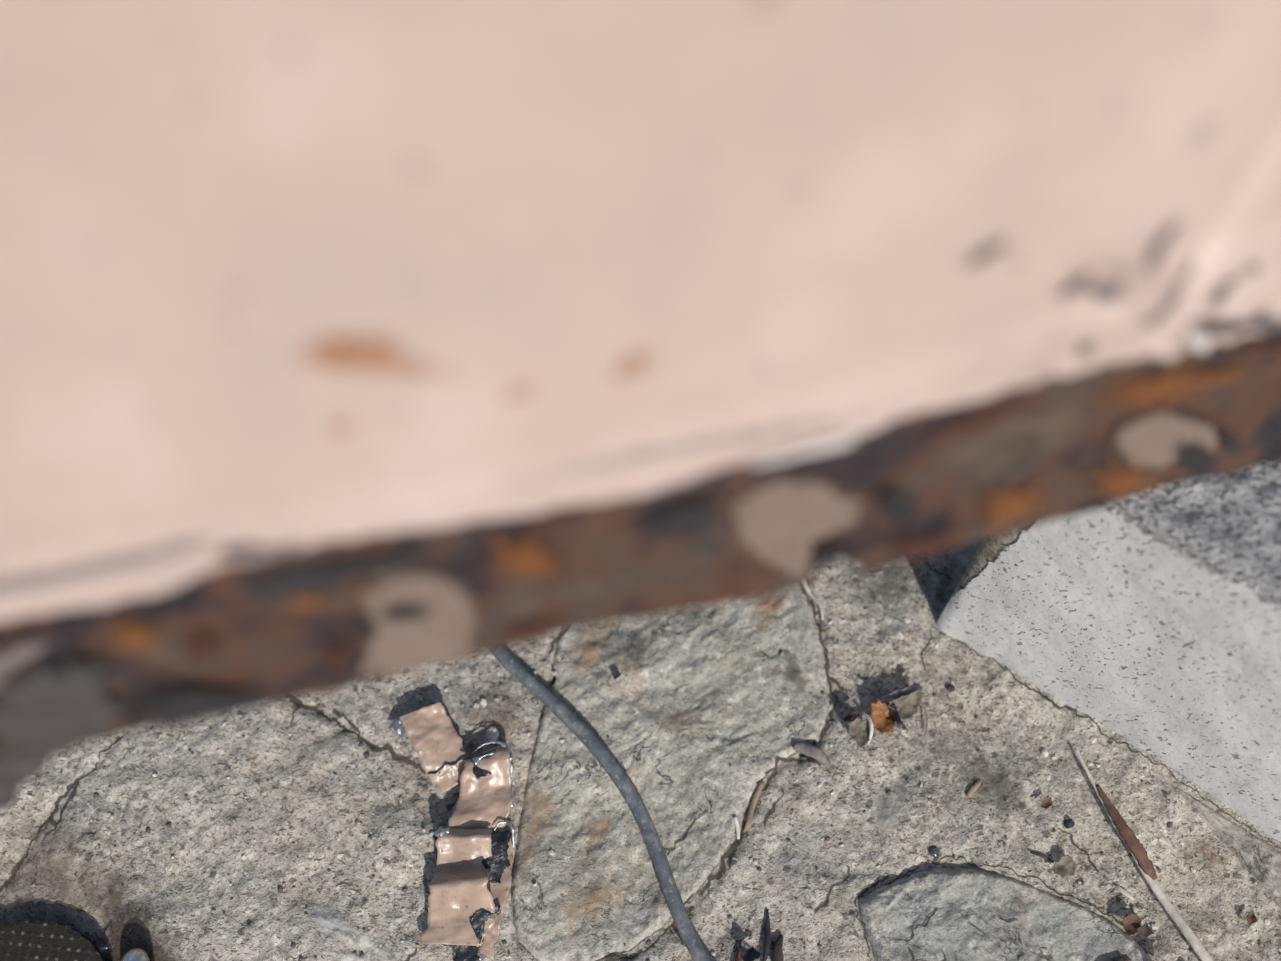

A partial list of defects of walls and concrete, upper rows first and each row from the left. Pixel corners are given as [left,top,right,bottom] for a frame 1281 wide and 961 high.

peeling [1186,275,1281,352]
corrosion [319,340,424,374]
corrosion [1088,460,1162,501]
corrosion [491,512,582,580]
crack [549,630,567,654]
crack [290,698,426,774]
crack [606,585,848,961]